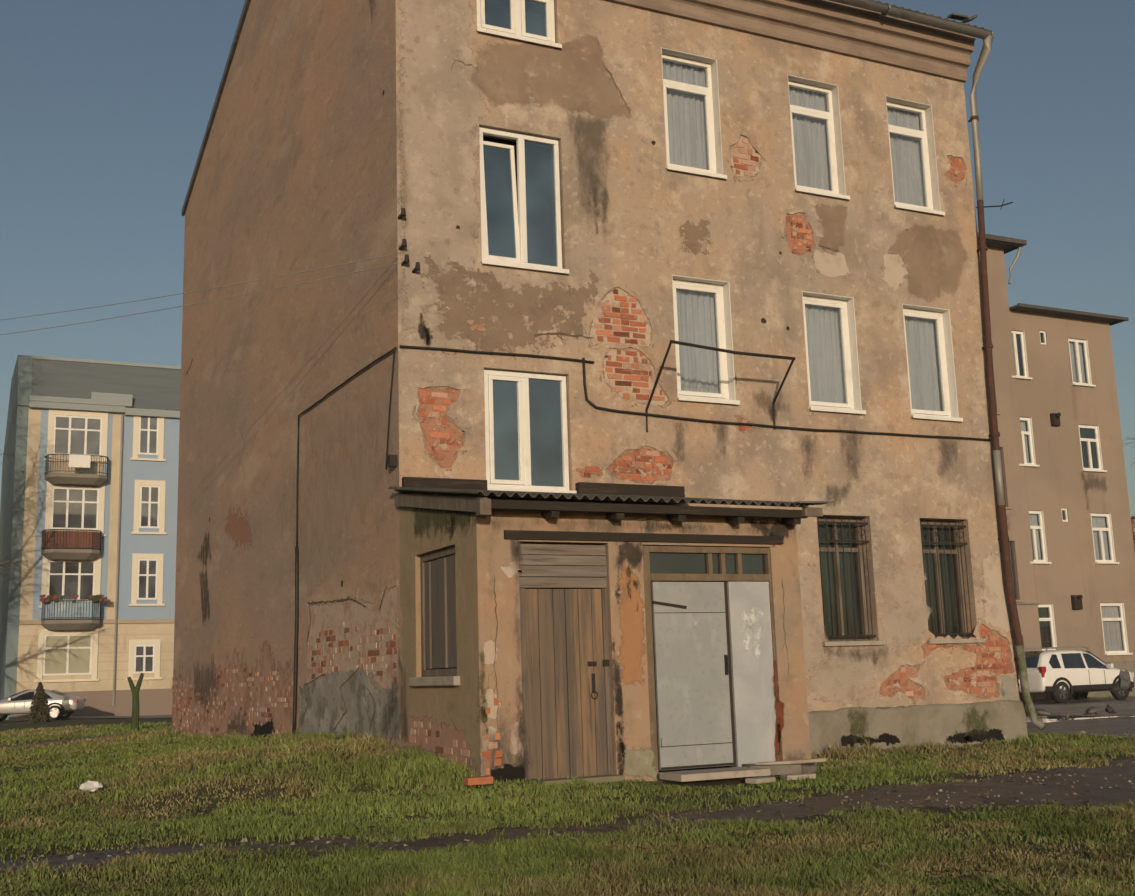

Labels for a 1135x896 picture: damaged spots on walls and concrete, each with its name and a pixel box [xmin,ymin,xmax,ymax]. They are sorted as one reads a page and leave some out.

peeling [383,0,678,413]
damp [575,119,607,215]
spalling [723,126,768,186]
spalling [777,203,837,273]
spalling [940,152,970,189]
spalling [409,375,472,476]
spalling [576,437,680,486]
spalling [171,576,403,738]
spalling [482,639,498,665]
peeling [617,565,649,687]
spalling [875,618,1019,707]
peeling [398,688,525,782]